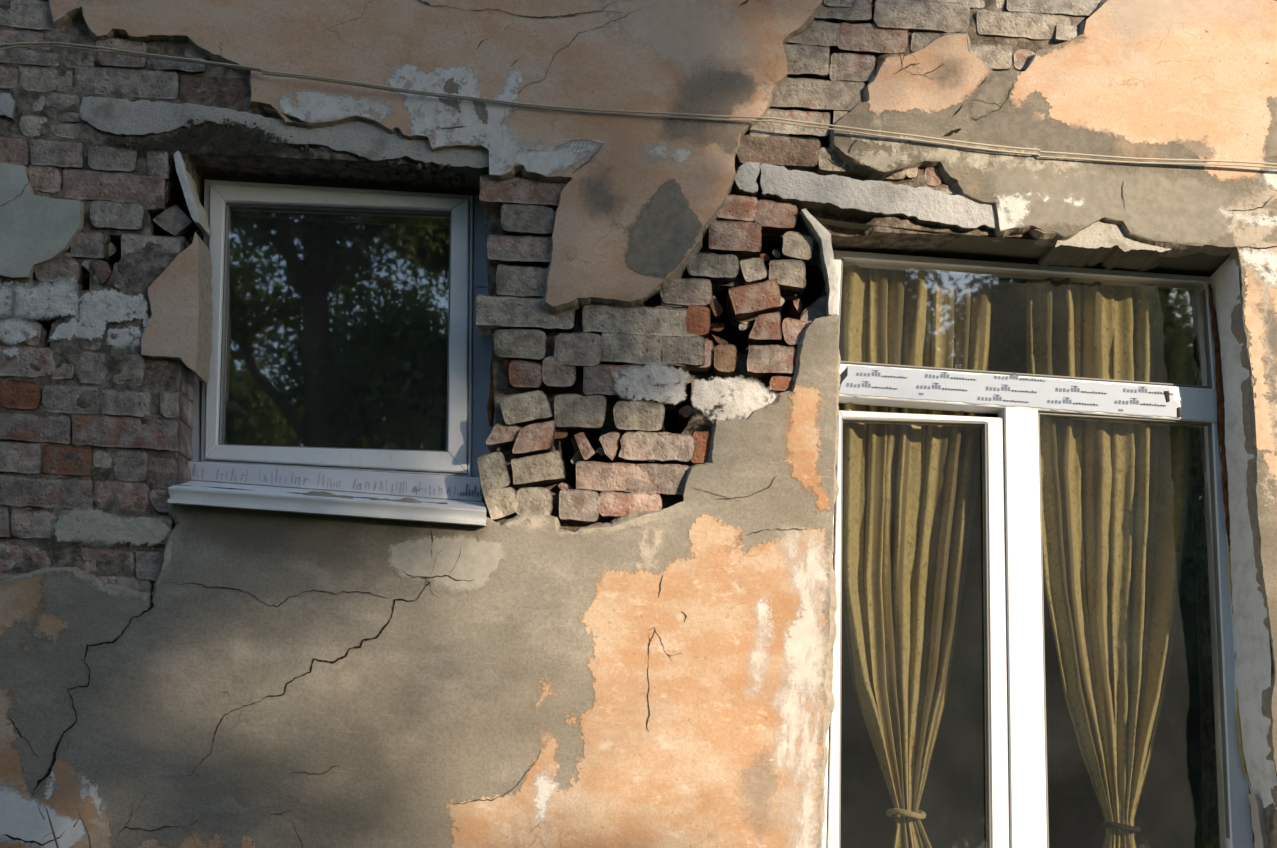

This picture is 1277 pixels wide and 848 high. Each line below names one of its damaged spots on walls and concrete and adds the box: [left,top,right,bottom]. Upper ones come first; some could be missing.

crack [419,0,645,174]
spalling [884,166,956,195]
peeling [736,0,1277,181]
spalling [0,0,250,648]
spalling [280,135,838,536]
peeling [1244,270,1277,479]
peeling [0,686,114,848]
crack [4,531,472,848]
crack [452,751,541,804]
peeling [445,512,830,848]